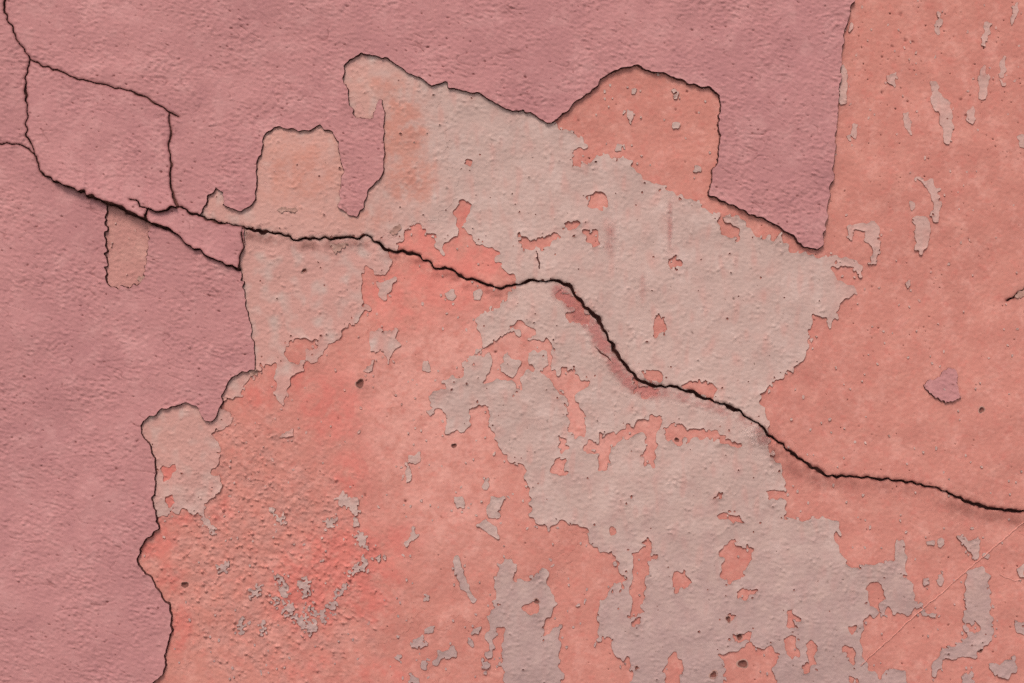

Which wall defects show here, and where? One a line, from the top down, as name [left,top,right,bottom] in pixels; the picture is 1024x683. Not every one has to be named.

peeling [343,54,394,81]
flaking render [105,206,152,289]
peeling [372,276,397,301]
crack [0,0,1024,513]
peeling [355,325,407,389]
peeling [450,477,514,539]
peeling [268,490,386,638]
peeling [452,555,491,603]